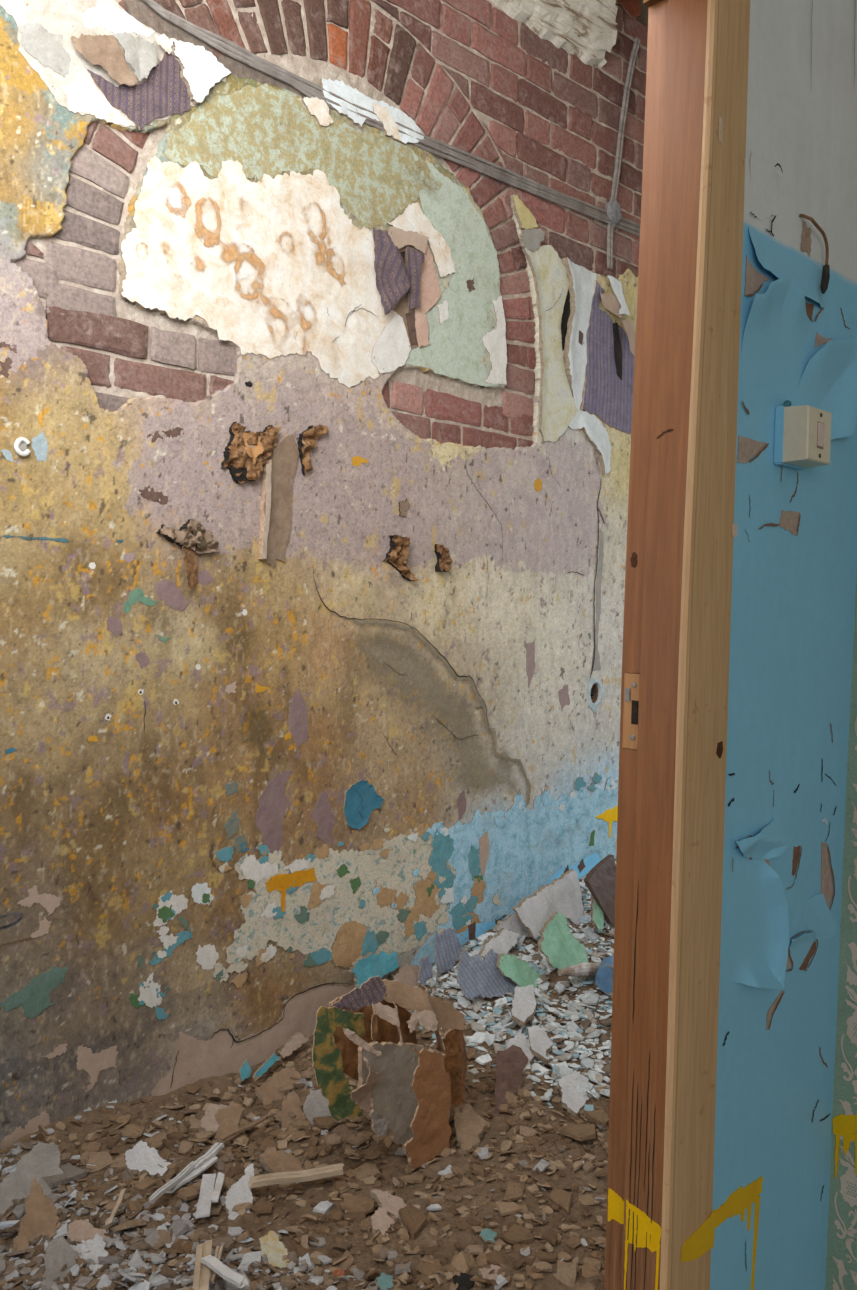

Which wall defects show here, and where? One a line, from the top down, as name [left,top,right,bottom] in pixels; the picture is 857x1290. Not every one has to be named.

flaking render [0,0,648,475]
peeling [740,227,857,440]
peeling [737,435,769,463]
crack [313,570,493,740]
peeling [129,770,618,1020]
peeling [725,805,840,1030]
peeling [151,983,355,1096]